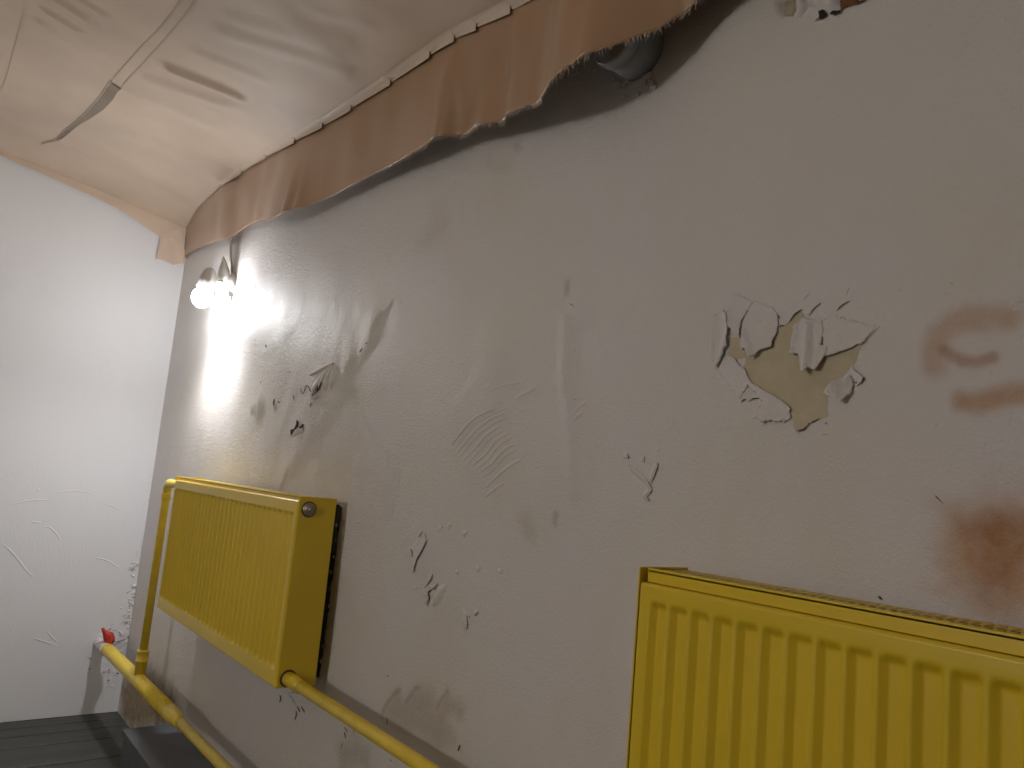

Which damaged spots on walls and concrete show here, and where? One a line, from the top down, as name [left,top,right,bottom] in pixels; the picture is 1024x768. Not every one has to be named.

spalling [783,0,865,21]
peeling [290,420,304,438]
peeling [293,363,337,407]
peeling [709,287,880,435]
corrosion [913,294,1024,422]
corrosion [899,447,1024,628]